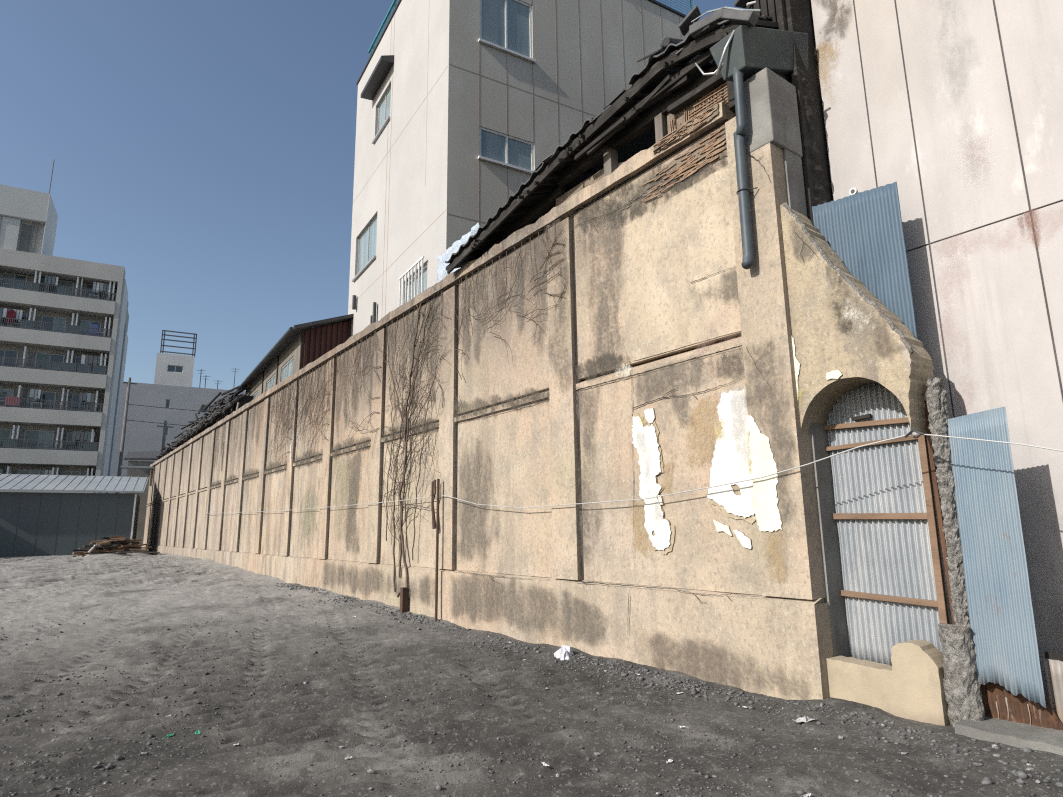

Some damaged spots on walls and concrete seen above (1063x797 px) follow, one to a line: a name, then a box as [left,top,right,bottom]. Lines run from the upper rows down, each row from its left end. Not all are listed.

leakage [454,156,724,461]
leakage [458,447,490,558]
peeling [630,408,676,555]
peeling [706,388,783,549]
leakage [452,575,604,643]
corrosion [980,682,1063,730]